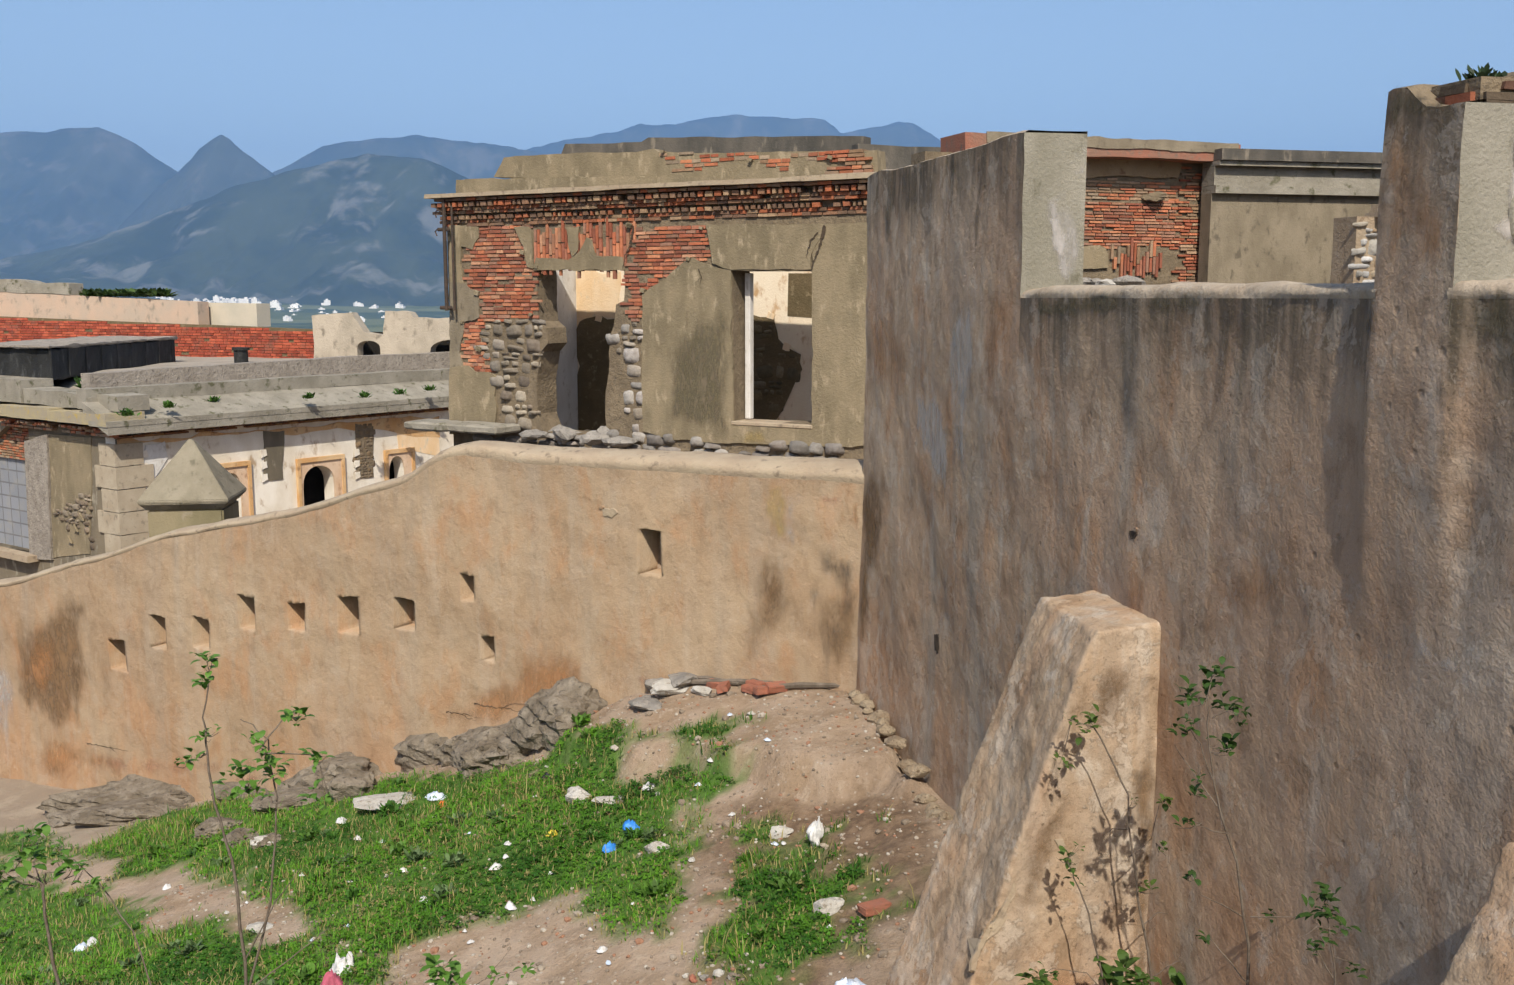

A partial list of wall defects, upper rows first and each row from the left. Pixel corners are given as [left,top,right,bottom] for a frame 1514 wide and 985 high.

peeling [659,150,845,172]
peeling [460,217,711,431]
damp [0,607,81,721]